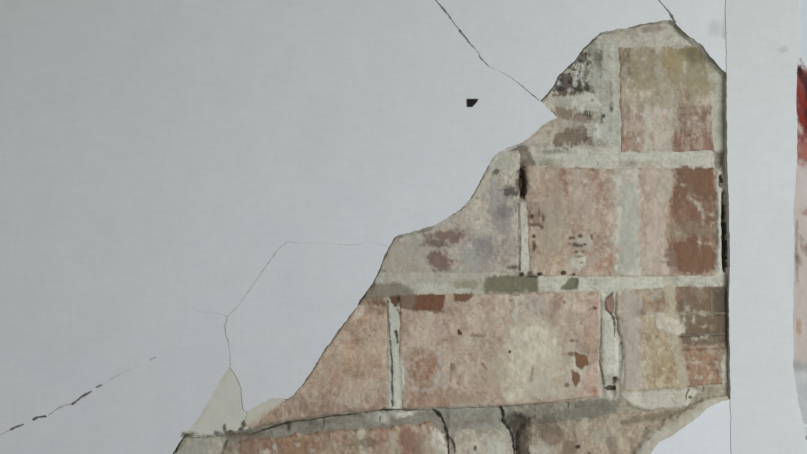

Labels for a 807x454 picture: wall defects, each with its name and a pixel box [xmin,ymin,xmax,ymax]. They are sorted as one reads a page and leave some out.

crack [436,0,488,65]
crack [303,237,396,385]
crack [256,300,456,454]
spalling [174,20,729,454]